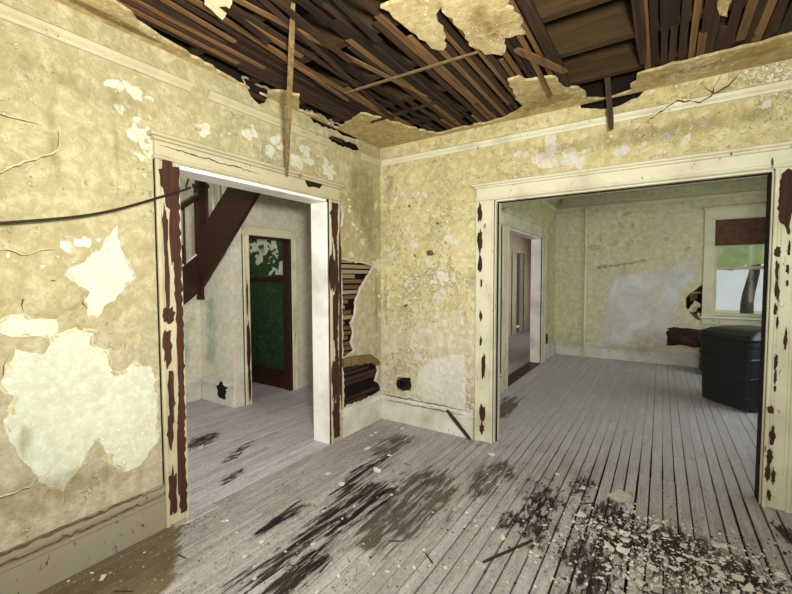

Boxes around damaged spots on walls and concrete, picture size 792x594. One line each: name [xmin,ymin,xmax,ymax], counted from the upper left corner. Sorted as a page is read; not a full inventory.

crack [0,100,60,174]
flaking render [116,0,554,151]
crack [647,71,741,123]
crack [0,355,10,383]
crack [0,245,63,256]
peeling [0,76,188,516]
peeling [329,197,396,439]
peeling [403,198,467,409]
peeling [773,169,792,392]
crack [0,486,165,567]
damp [221,434,458,594]
peeling [764,425,776,501]